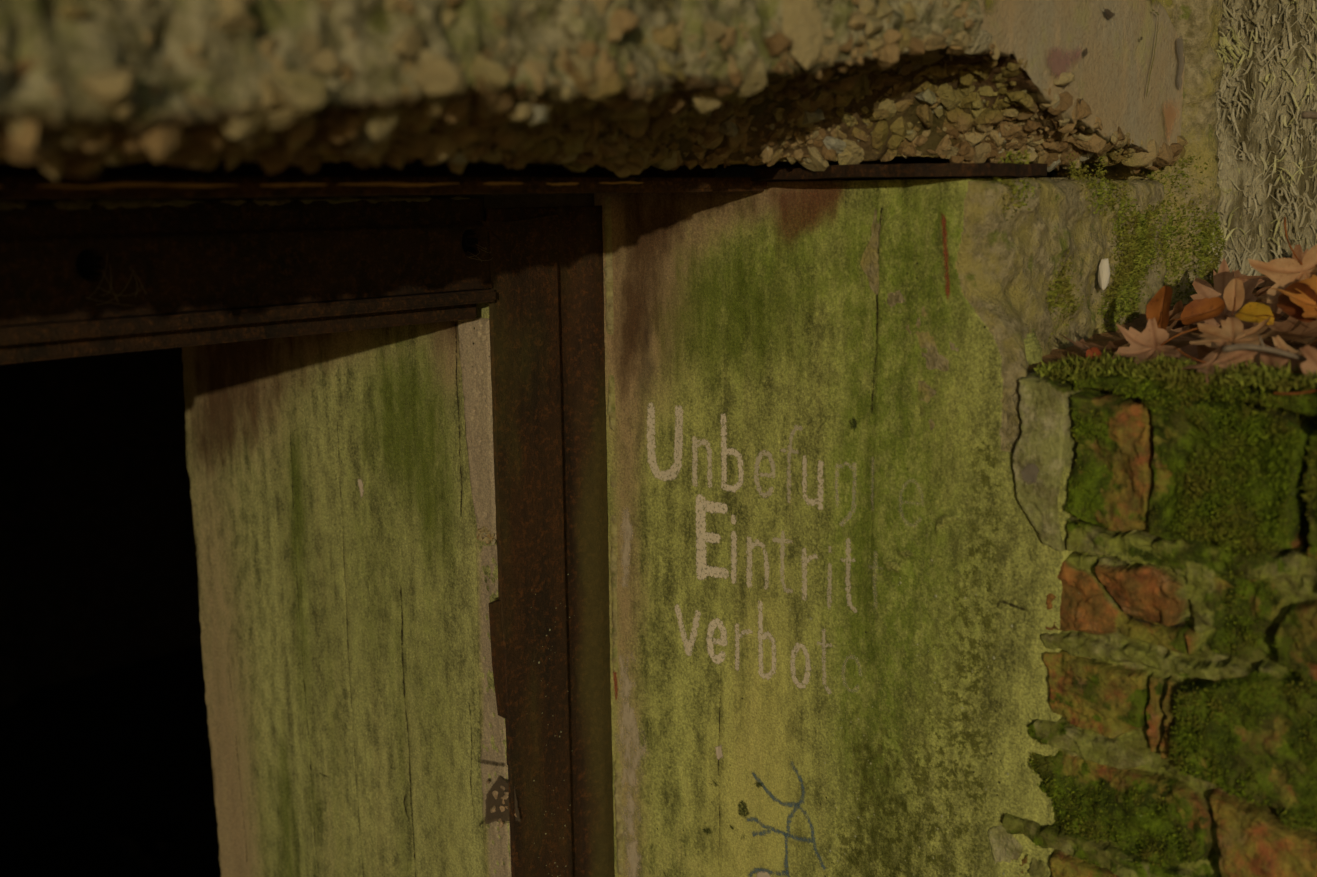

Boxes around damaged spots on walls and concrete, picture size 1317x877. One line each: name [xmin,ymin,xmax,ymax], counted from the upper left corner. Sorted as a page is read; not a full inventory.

spalling [0,0,1188,180]
efflorescence [619,656,646,877]
leakage [730,801,749,837]